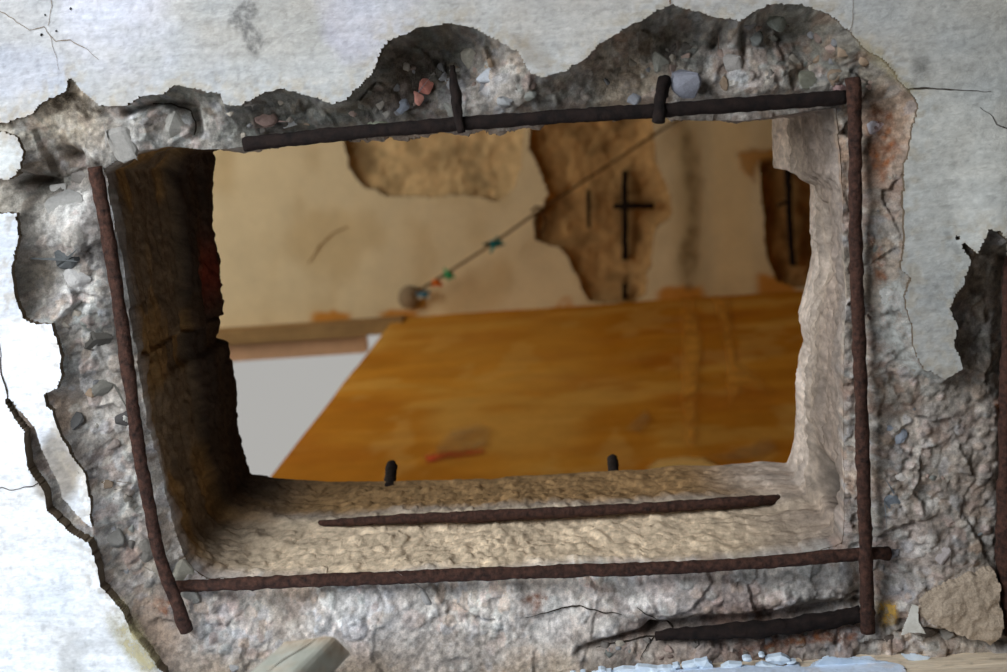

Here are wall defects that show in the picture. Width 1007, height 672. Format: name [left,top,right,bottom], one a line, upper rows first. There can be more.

crack [0,1,99,71]
spalling [105,23,672,303]
crack [907,87,1007,129]
crack [0,349,8,401]
spalling [0,79,859,672]
spalling [546,3,1007,637]
spalling [180,561,1007,672]
crack [526,605,674,660]